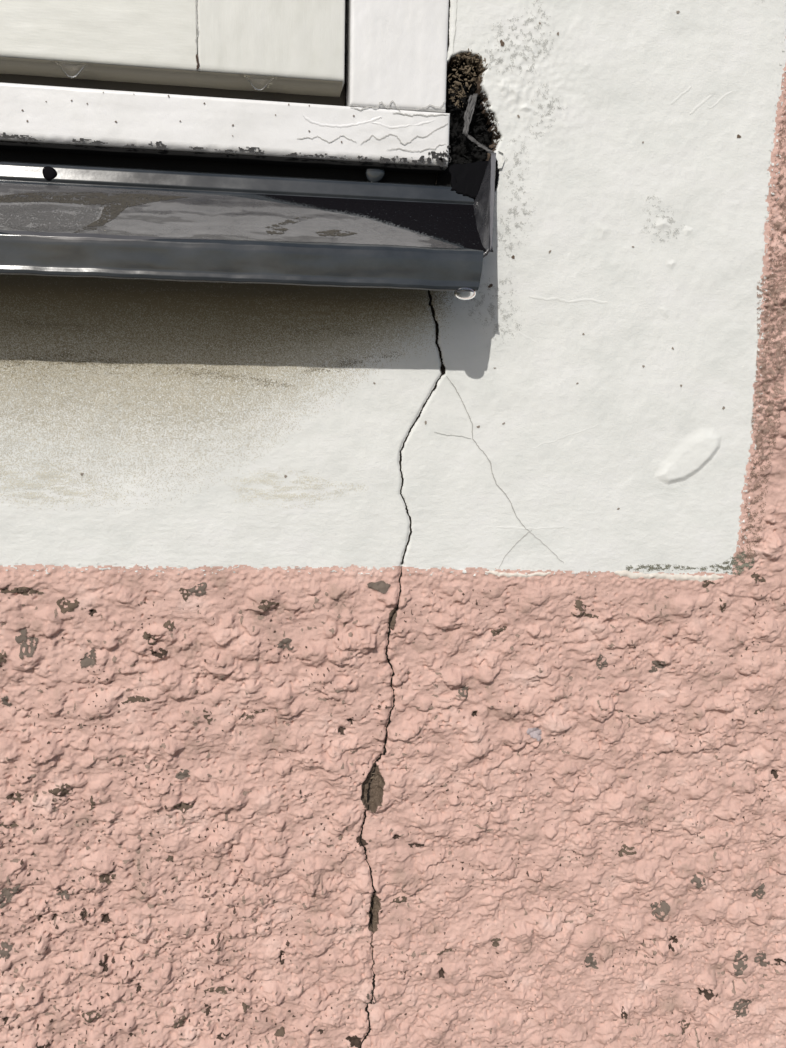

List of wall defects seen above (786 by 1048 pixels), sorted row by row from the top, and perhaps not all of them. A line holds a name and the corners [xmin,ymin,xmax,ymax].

crack [360,290,564,1048]